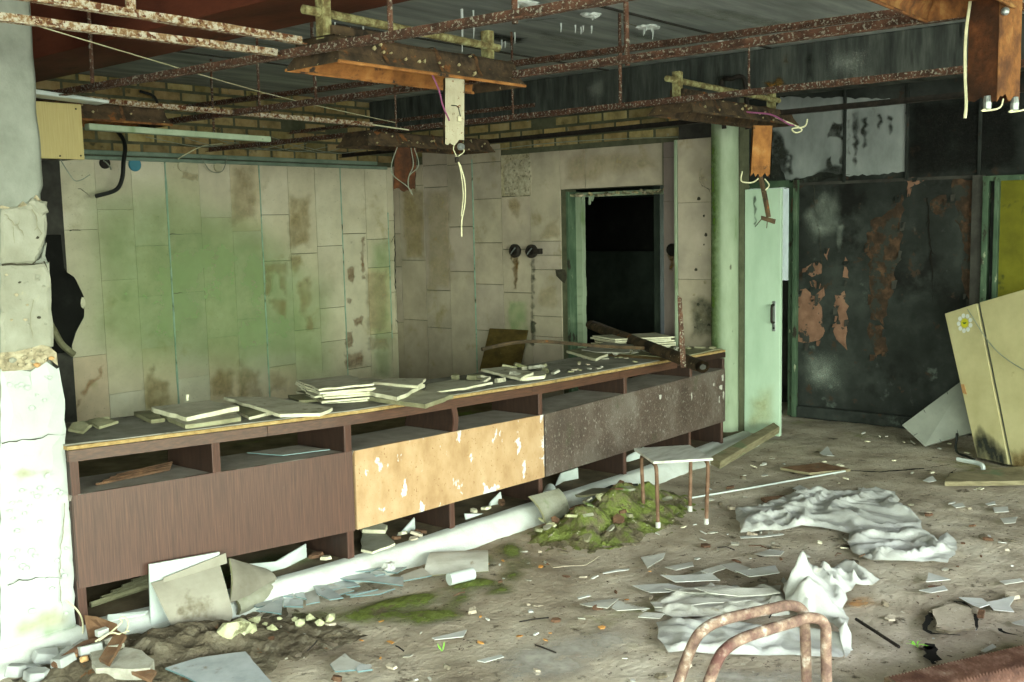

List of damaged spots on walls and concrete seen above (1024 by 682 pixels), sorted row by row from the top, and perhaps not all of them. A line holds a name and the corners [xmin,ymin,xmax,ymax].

leakage [771,131,842,183]
leakage [853,115,893,163]
peeling [0,195,49,216]
peeling [772,96,924,361]
spalling [5,236,48,326]
spalling [0,345,58,371]
leakage [346,317,363,367]
crack [2,433,68,444]
crack [9,503,65,630]